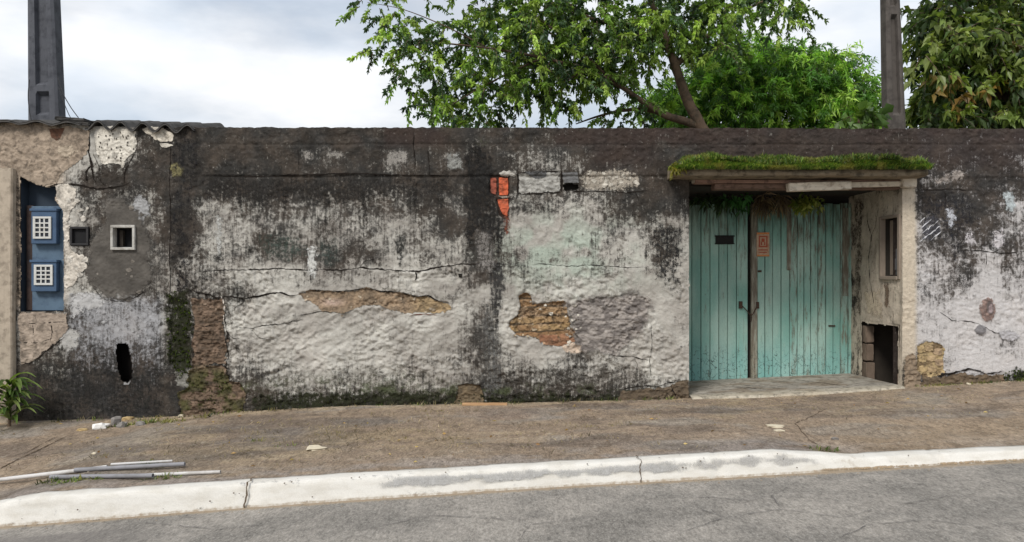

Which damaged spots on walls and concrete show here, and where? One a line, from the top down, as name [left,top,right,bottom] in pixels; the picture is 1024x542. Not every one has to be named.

crack [47,133,133,190]
peeling [0,116,174,365]
crack [95,137,634,382]
water stain [171,131,651,397]
water stain [645,224,685,296]
water stain [922,170,979,260]
water stain [992,228,1005,249]
water stain [1003,192,1015,211]
flaking render [175,298,246,416]
spalling [299,287,451,317]
spalling [509,290,654,356]
flaking render [904,341,1005,387]